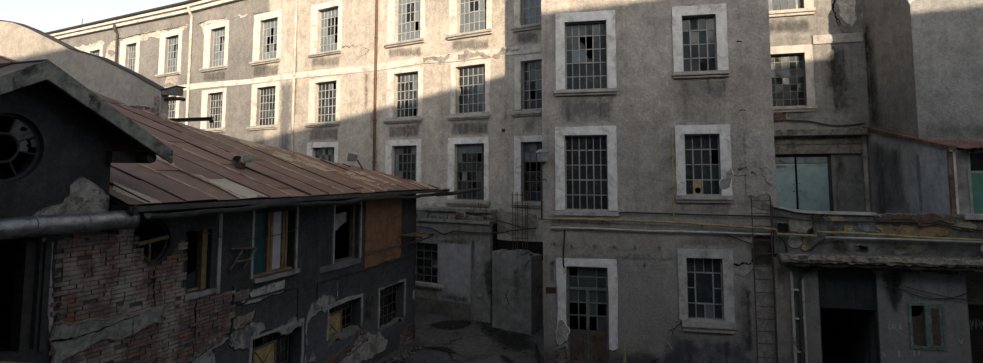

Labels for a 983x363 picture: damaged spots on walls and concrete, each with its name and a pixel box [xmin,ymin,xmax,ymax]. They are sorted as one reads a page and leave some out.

flaking render [29,175,111,216]
peeling [872,212,978,256]
flaking render [46,227,337,363]
flaking render [340,294,388,363]
flaking render [553,319,570,363]
flaking render [750,213,869,363]